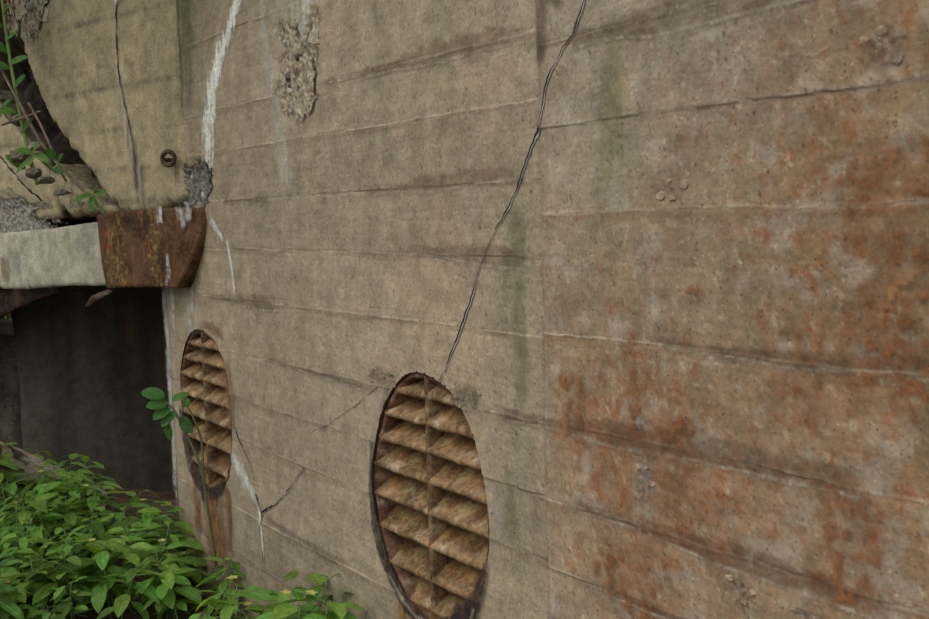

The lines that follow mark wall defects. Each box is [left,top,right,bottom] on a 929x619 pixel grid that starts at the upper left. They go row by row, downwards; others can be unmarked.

spalling [3,0,49,47]
crack [115,4,132,138]
water stain [202,0,242,178]
spalling [271,5,320,132]
spalling [183,151,213,208]
crack [439,0,585,382]